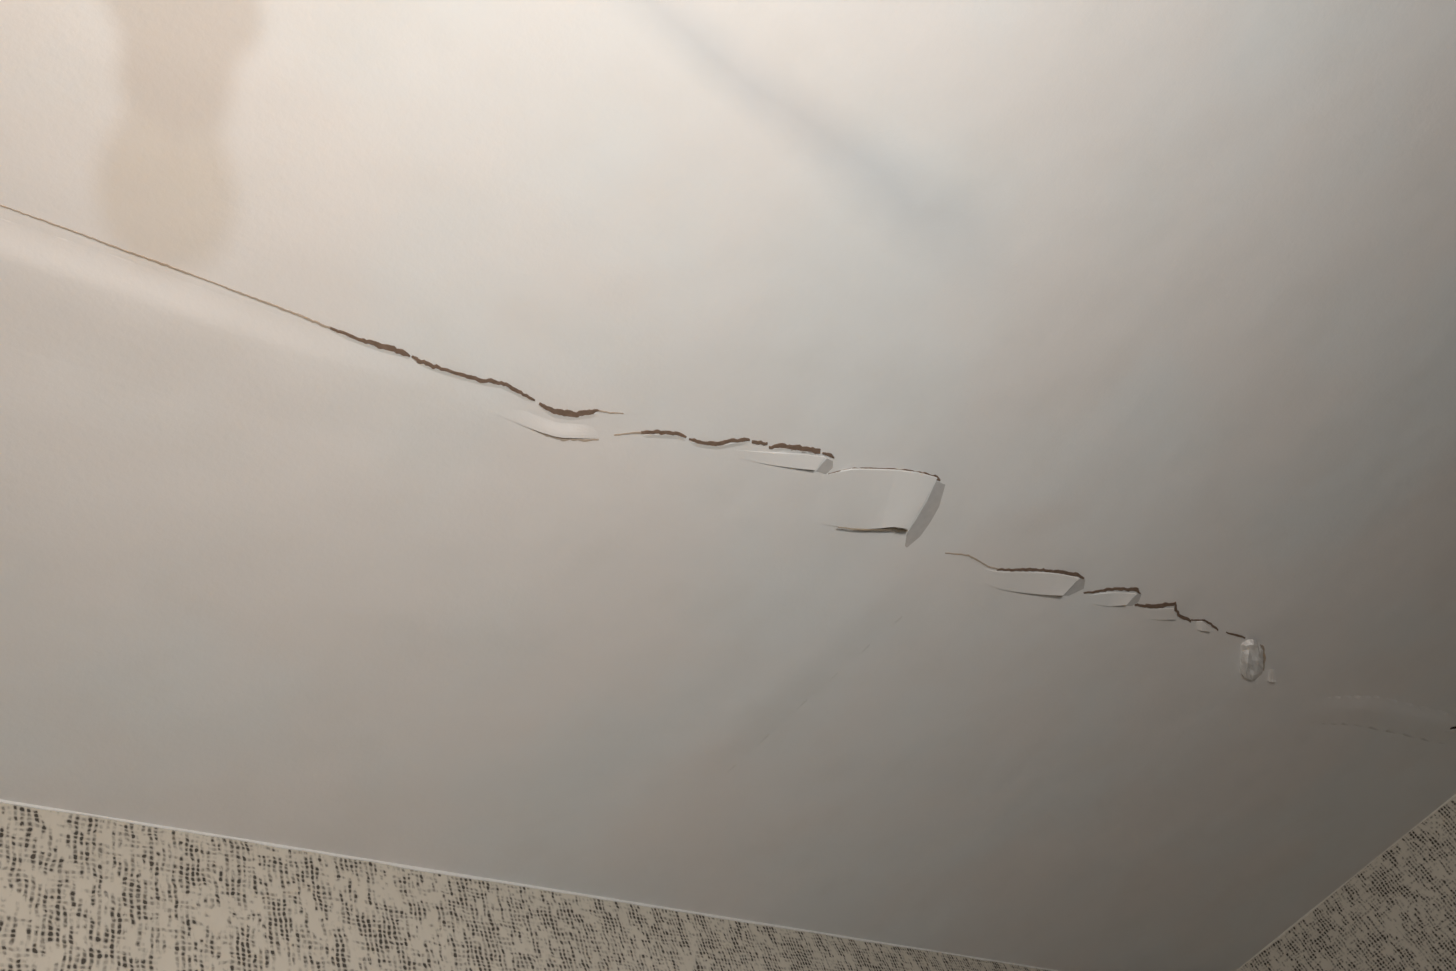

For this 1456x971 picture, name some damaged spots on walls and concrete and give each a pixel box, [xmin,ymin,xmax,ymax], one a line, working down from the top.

crack [945,553,1245,639]